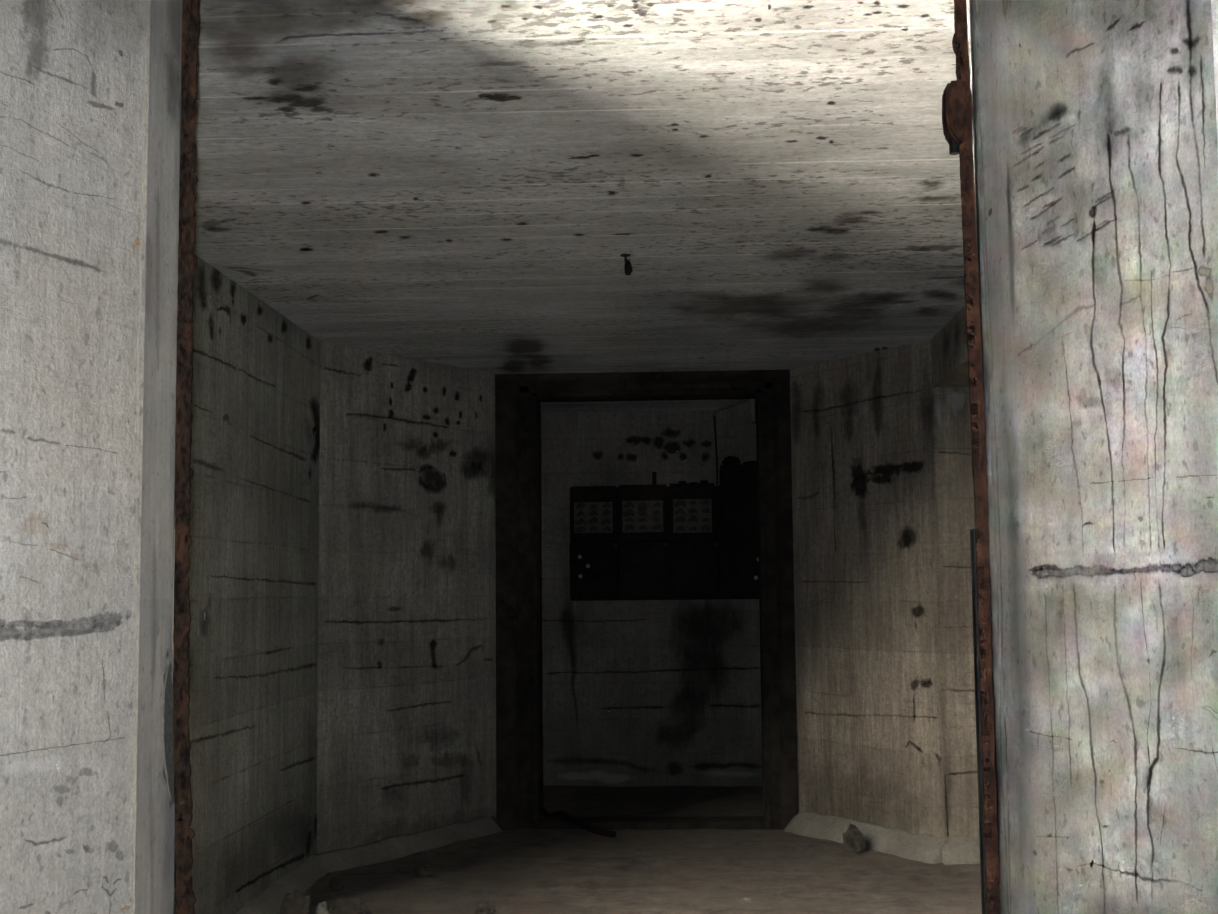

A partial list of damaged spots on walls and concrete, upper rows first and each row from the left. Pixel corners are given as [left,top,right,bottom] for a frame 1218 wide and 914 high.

crack [38,48,113,110]
corrosion [952,31,961,80]
crack [23,172,112,199]
crack [1,241,100,272]
crack [1062,0,1218,549]
crack [1032,564,1057,572]
crack [1068,586,1170,909]